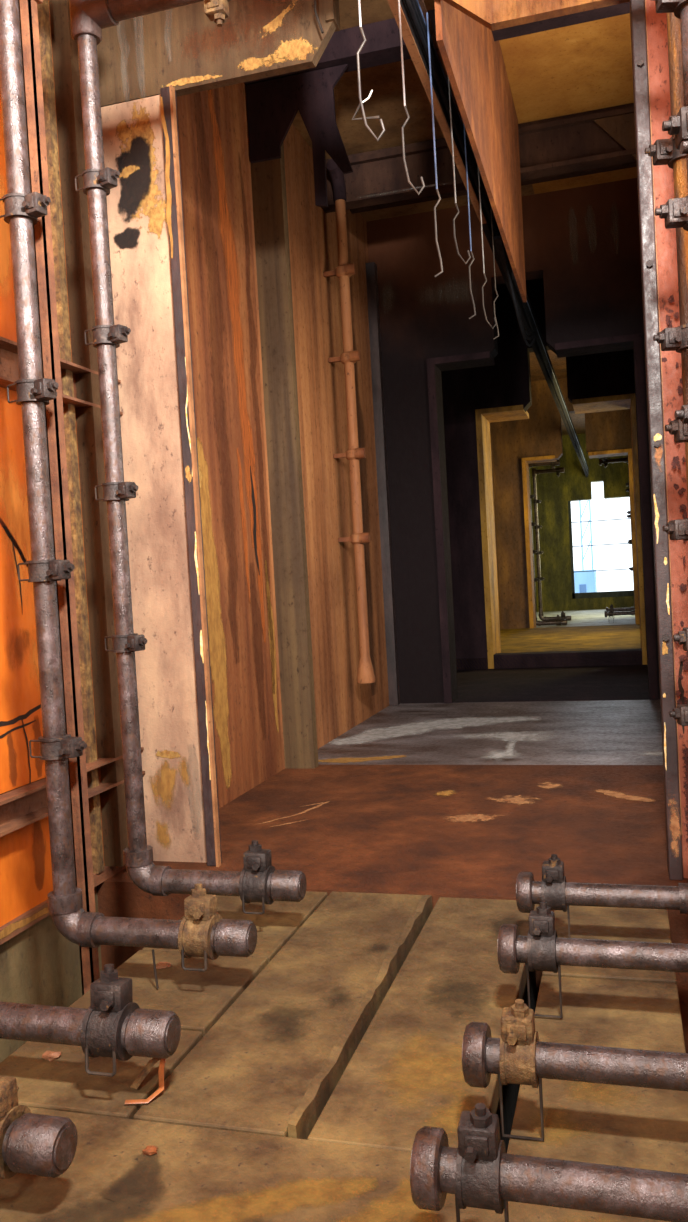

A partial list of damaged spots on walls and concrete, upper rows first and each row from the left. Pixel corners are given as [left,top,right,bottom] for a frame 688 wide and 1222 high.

peeling [238,1,317,71]
peeling [114,74,222,258]